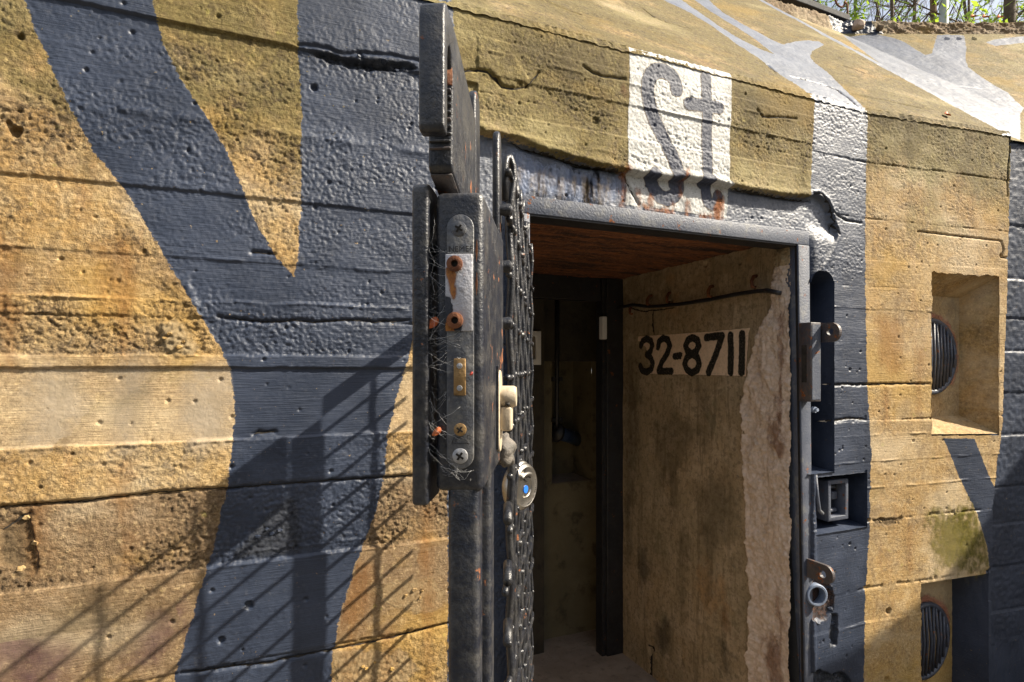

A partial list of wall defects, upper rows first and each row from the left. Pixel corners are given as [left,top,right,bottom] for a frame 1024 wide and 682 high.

crack [464,70,539,90]
rust [643,196,724,220]